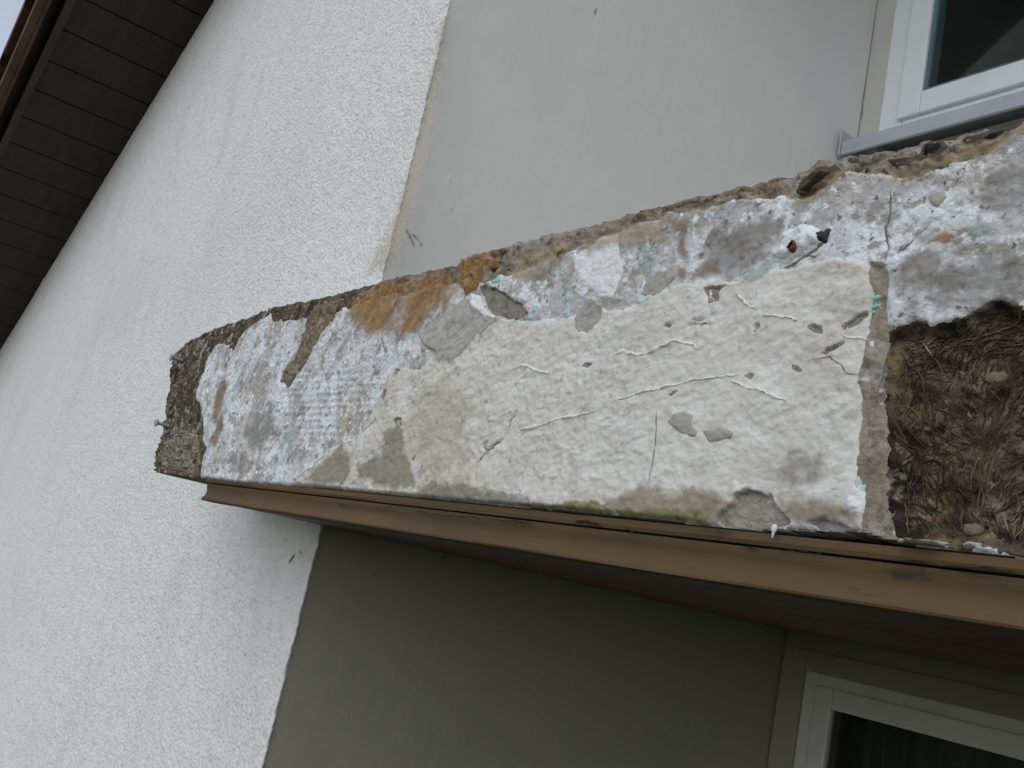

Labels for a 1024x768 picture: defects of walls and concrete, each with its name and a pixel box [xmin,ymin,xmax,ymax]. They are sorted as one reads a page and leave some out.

rust [460,252,500,291]
rust [351,276,445,330]
spalling [154,121,1024,478]
crack [813,355,857,375]
flaking render [715,486,771,529]